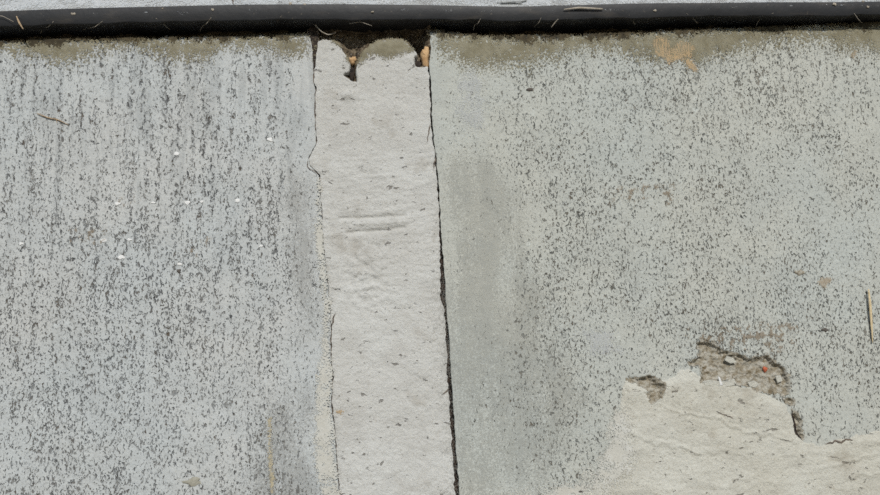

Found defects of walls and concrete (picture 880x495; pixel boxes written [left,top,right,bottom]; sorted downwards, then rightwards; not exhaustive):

crack [307,26,323,220]
crack [323,242,346,495]
crack [427,68,459,495]
spalling [626,374,666,407]
spalling [687,339,805,440]